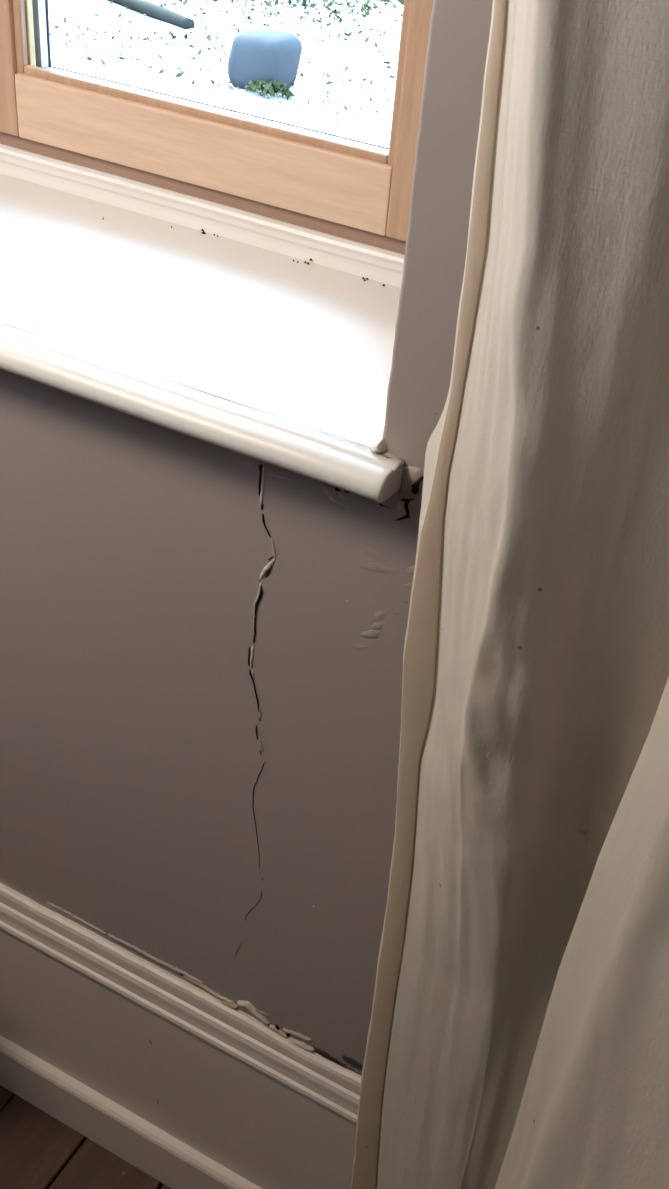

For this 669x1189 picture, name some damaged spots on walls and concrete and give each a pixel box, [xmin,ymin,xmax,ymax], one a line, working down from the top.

crack [234,464,276,957]